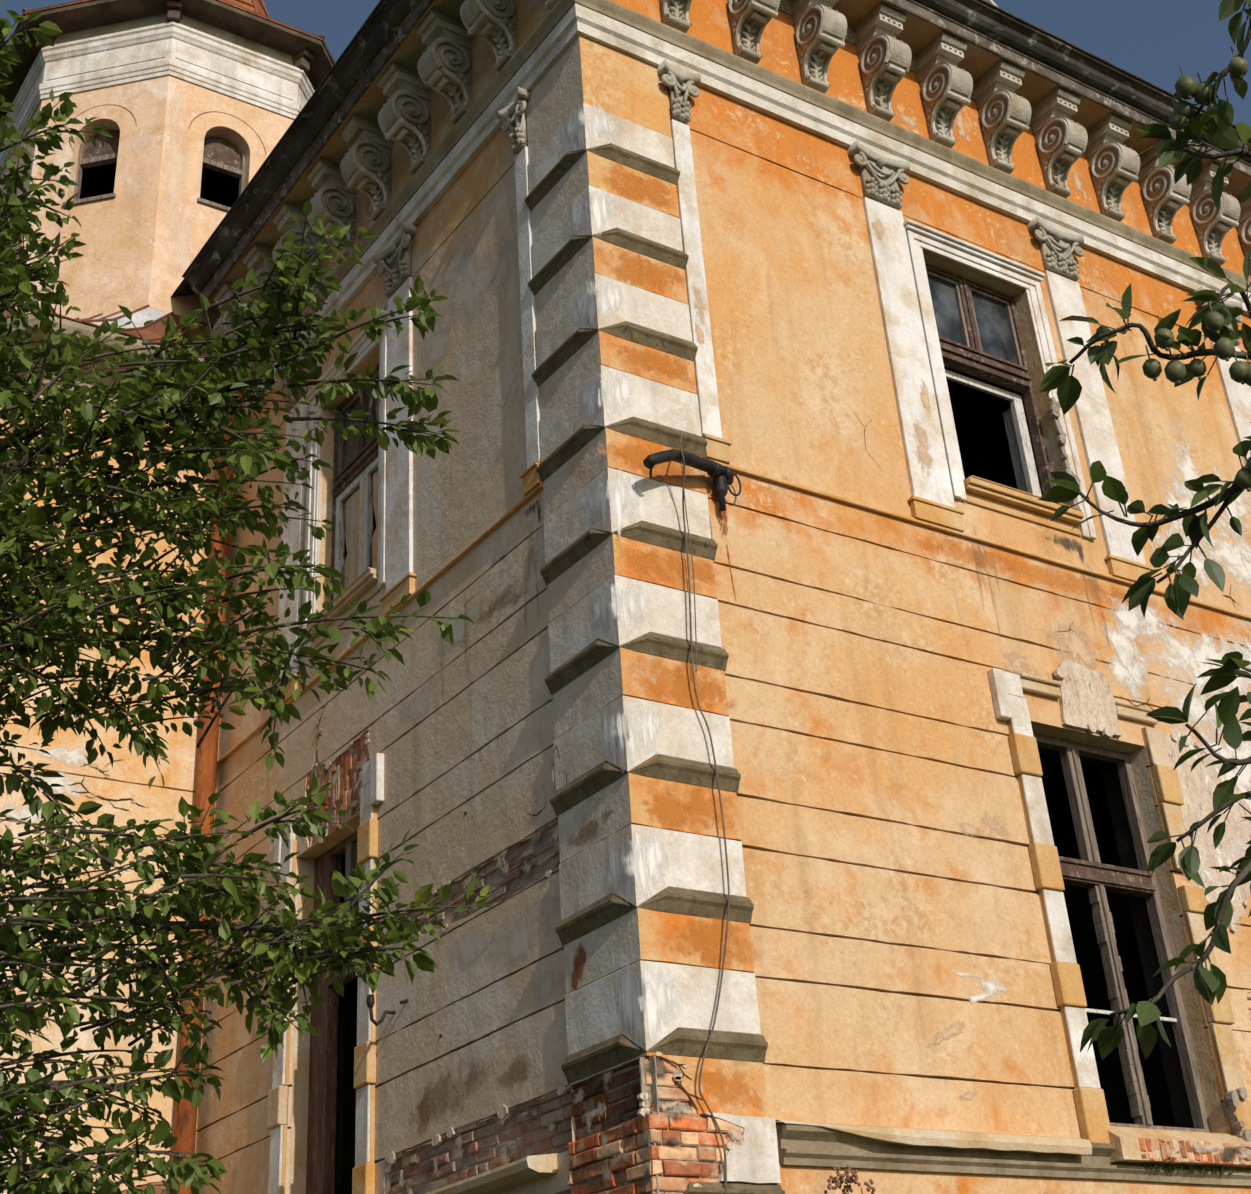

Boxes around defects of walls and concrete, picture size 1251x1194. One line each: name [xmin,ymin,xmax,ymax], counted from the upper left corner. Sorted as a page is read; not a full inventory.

crack [67,755,150,811]
spalling [306,725,372,847]
spalling [1004,596,1251,932]
spalling [398,818,560,940]
spalling [1232,989,1251,1033]
spalling [384,1054,748,1194]
spalling [1138,1087,1251,1168]